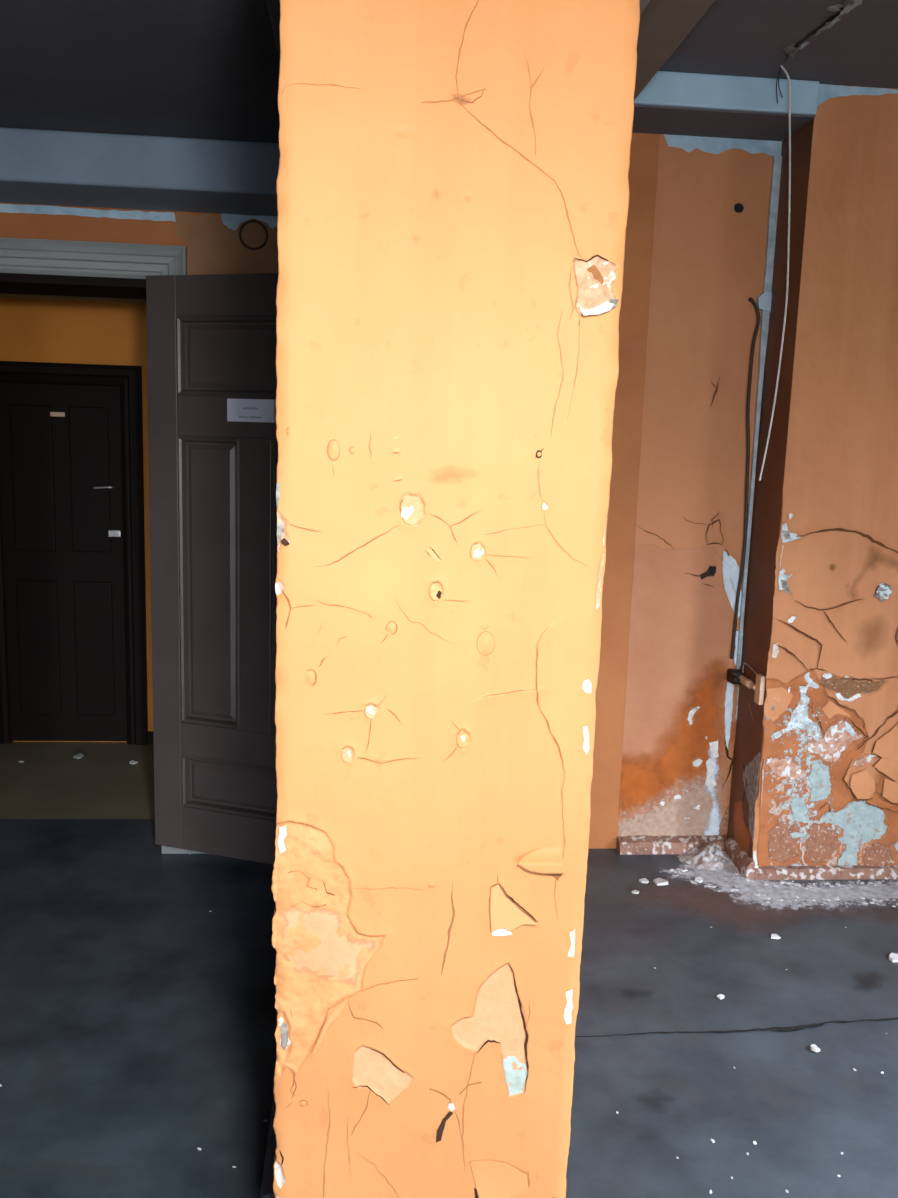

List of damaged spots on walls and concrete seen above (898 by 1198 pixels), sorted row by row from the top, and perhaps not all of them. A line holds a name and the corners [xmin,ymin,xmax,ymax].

crack [781,0,863,65]
spalling [460,103,619,324]
peeling [622,85,898,880]
spalling [470,502,605,609]
crack [796,528,898,553]
crack [777,599,862,672]
crack [485,627,565,775]
peeling [273,821,415,1096]
peeling [350,1046,413,1136]
crack [429,1082,481,1142]
peeling [451,963,530,1164]
crack [576,1017,898,1037]